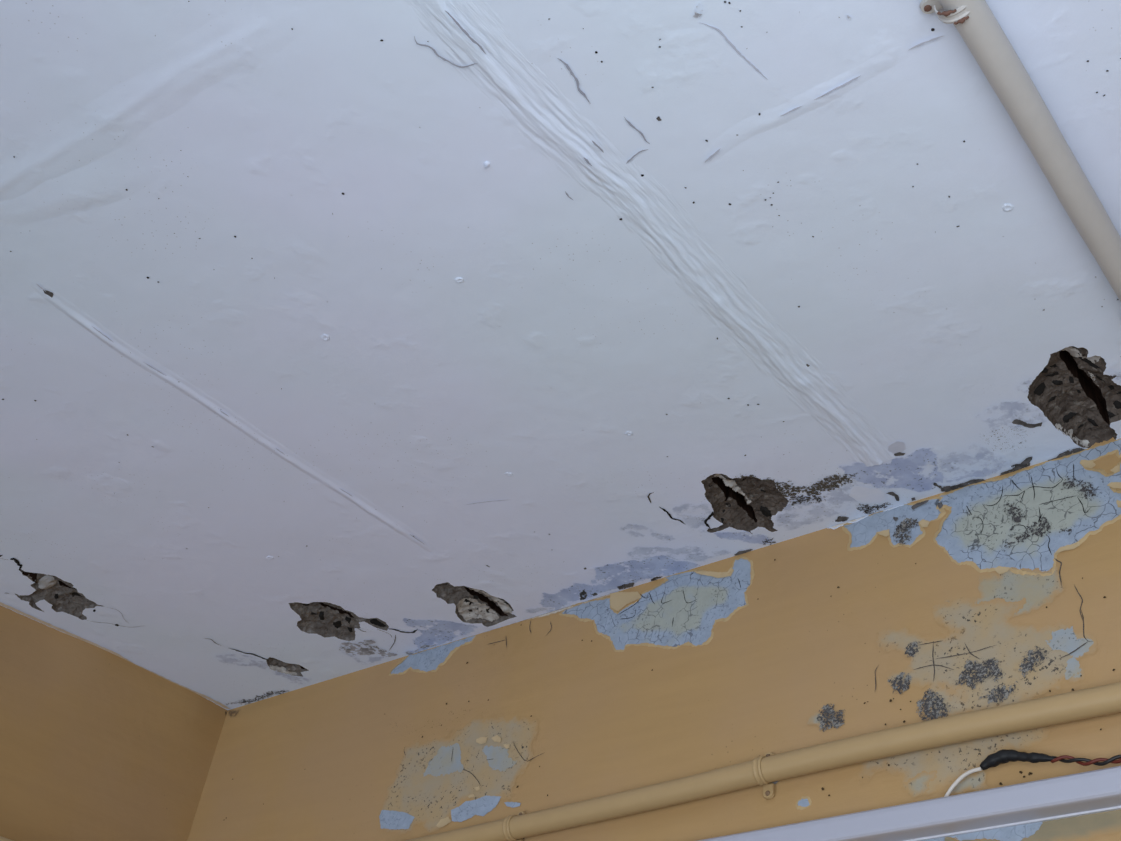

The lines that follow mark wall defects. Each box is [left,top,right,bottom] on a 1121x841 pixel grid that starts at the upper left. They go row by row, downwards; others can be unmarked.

spalling [647,474,789,534]
peeling [841,346,1121,723]
spalling [0,555,140,627]
spalling [210,639,309,677]
spalling [289,582,522,676]
peeling [559,556,759,652]
leakage [806,704,845,732]
leakage [888,672,913,694]
leakage [916,688,951,721]
leakage [955,657,1018,706]
peeling [376,715,543,837]